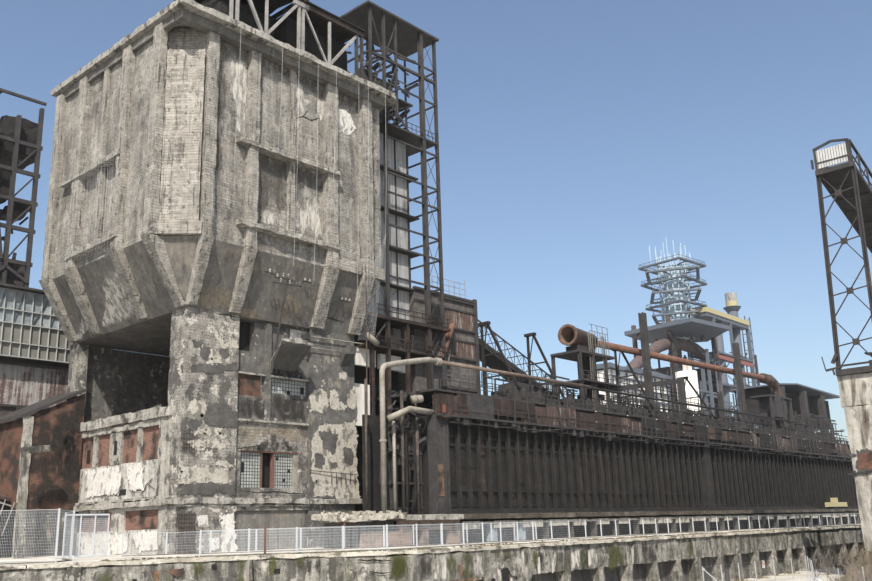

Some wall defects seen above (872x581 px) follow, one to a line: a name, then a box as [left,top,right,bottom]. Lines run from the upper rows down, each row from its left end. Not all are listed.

leakage [216,41,249,172]
leakage [263,61,324,120]
flaking render [338,108,356,138]
leakage [296,198,323,237]
flaking render [191,317,239,374]
flaking render [307,371,361,499]
leakage [851,381,869,443]
flaking render [85,462,144,499]
flaking render [174,398,239,554]
flaking render [80,530,157,555]
leakage [391,556,405,578]
leakage [522,549,593,574]